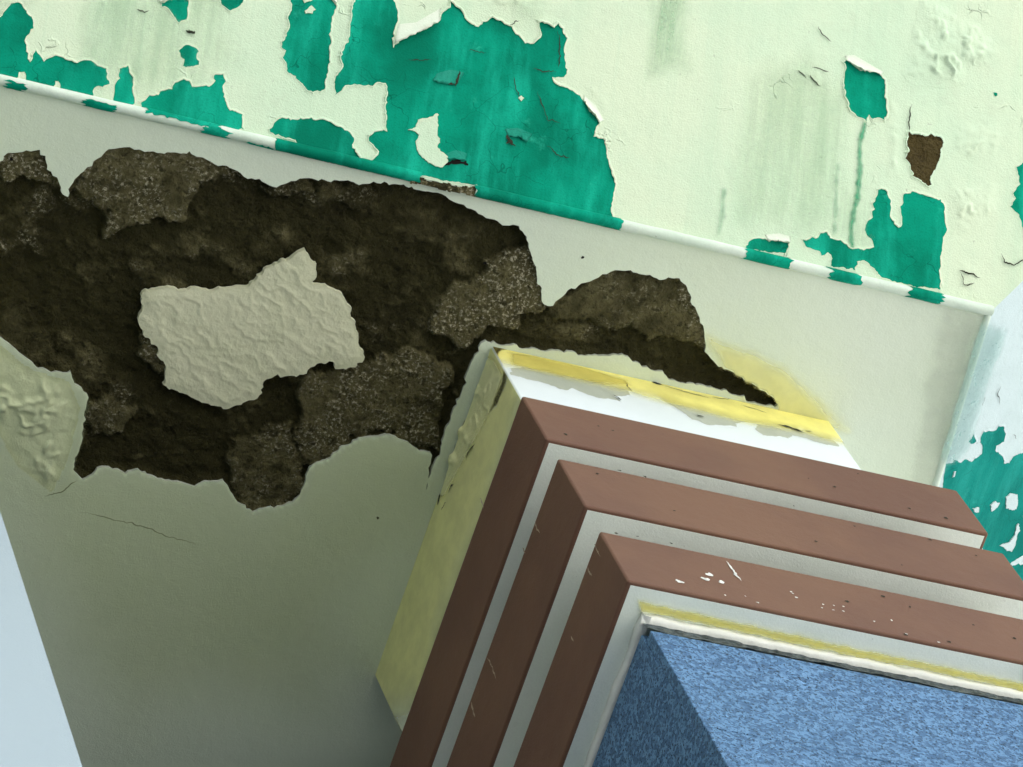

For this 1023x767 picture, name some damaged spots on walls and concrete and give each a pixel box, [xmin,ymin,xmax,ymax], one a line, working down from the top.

peeling [840,55,890,125]
flaking render [0,0,779,512]
peeling [741,129,949,305]
peeling [1008,159,1023,232]
peeling [658,397,842,448]
water stain [375,349,842,707]
peeling [941,423,1023,580]